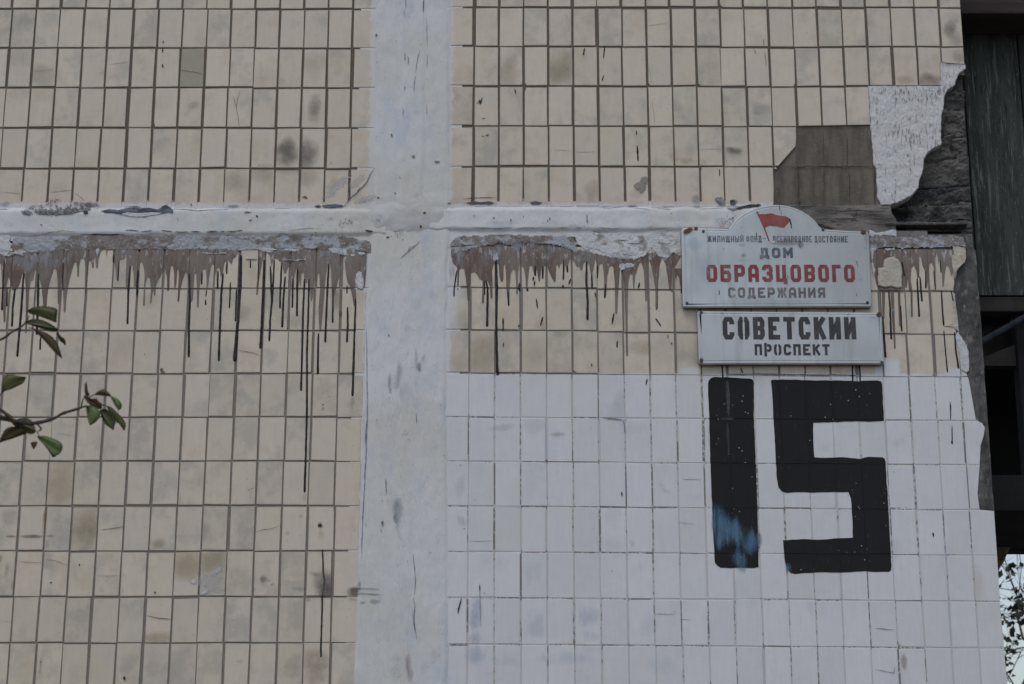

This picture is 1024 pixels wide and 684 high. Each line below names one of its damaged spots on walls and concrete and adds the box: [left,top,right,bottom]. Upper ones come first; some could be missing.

water stain [1,260,98,357]
peeling [0,205,373,262]
water stain [113,254,366,493]
peeling [356,271,364,289]
water stain [453,259,682,376]
flaking render [717,63,996,533]
water stain [875,259,959,373]